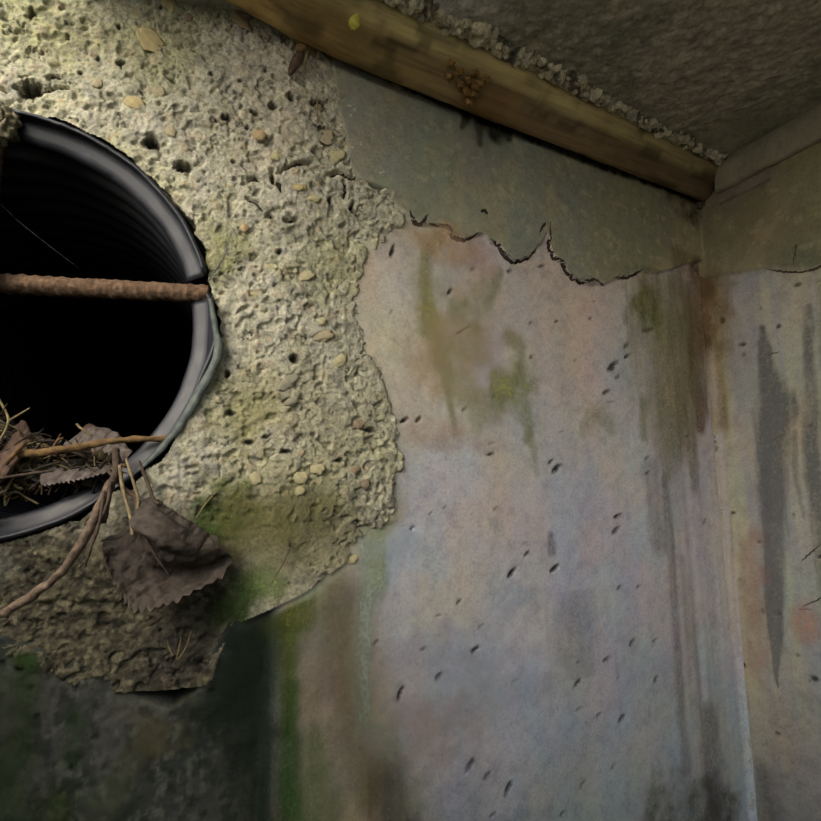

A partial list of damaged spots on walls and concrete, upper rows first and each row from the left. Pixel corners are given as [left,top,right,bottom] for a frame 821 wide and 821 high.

spalling [0,0,406,693]
water stain [743,326,821,688]
water stain [276,599,317,821]